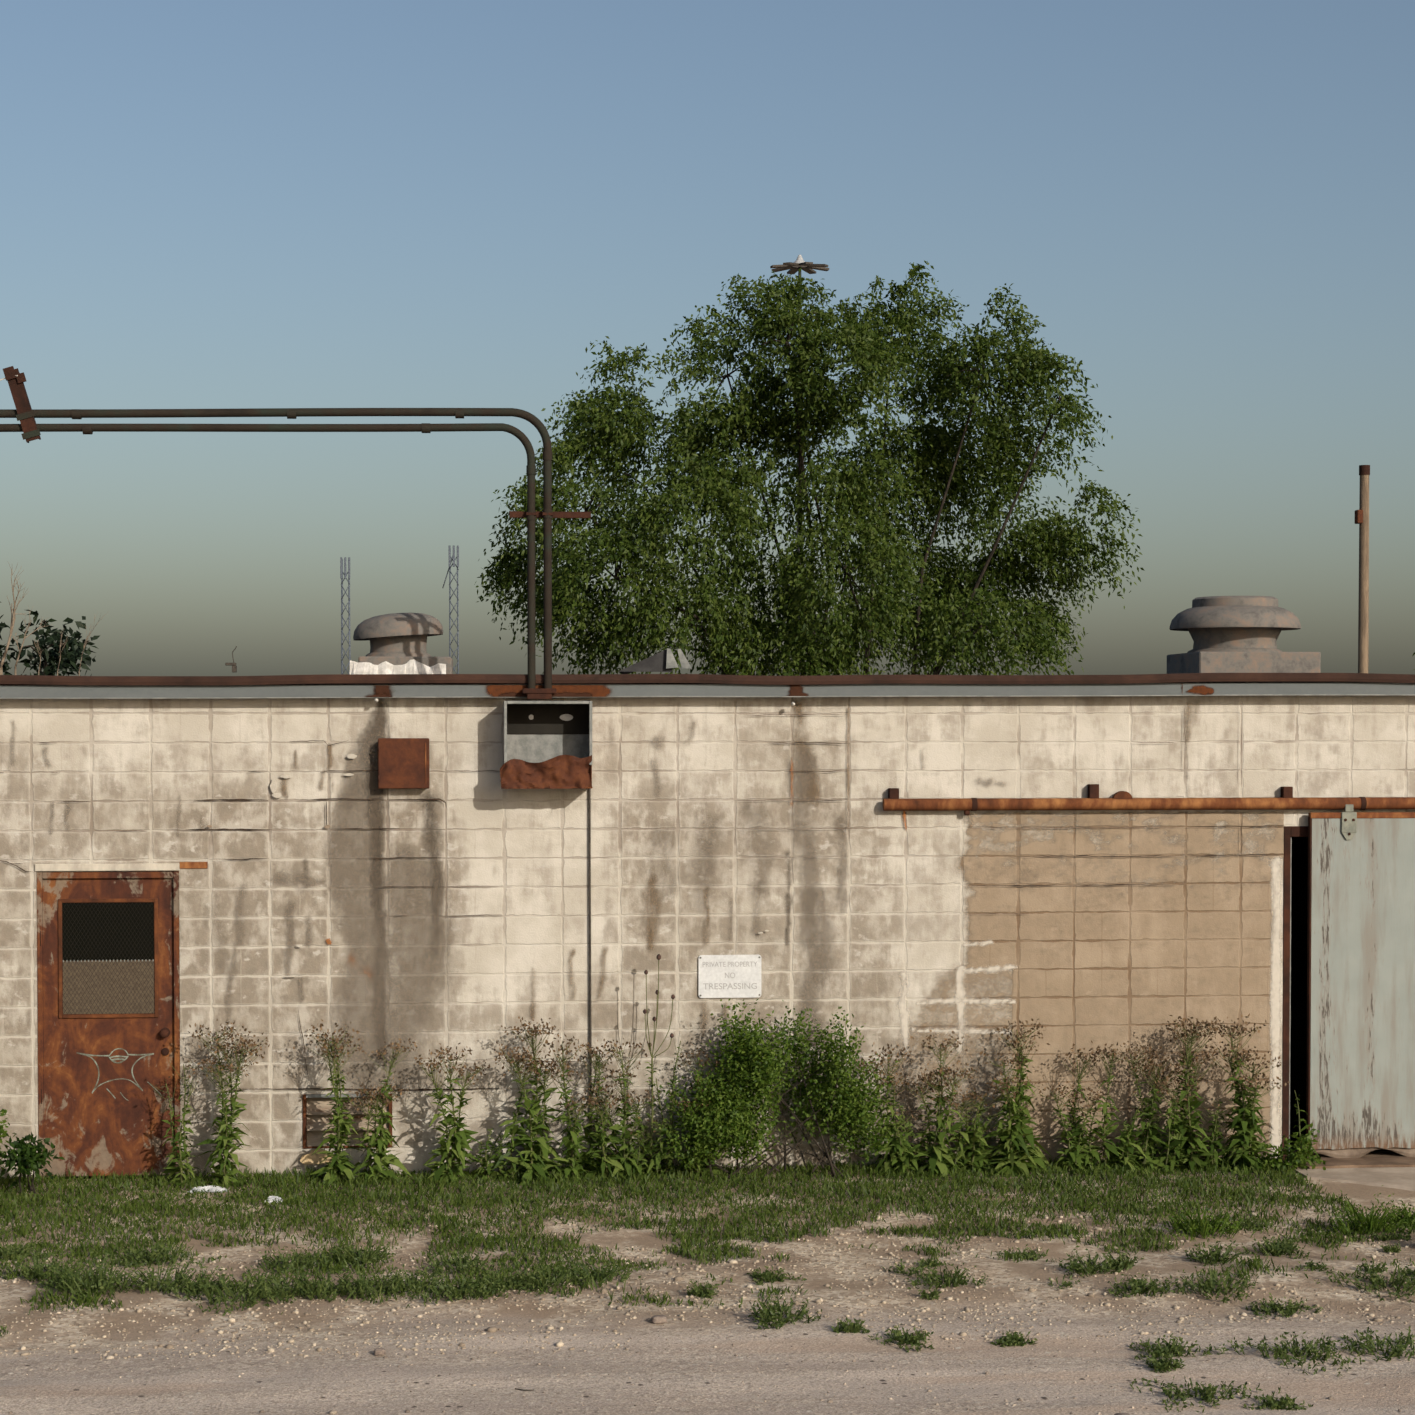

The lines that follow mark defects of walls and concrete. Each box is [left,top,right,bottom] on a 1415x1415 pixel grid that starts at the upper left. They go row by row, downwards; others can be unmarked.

water stain [796,741,819,816]
water stain [330,699,449,1092]
water stain [786,839,829,1032]